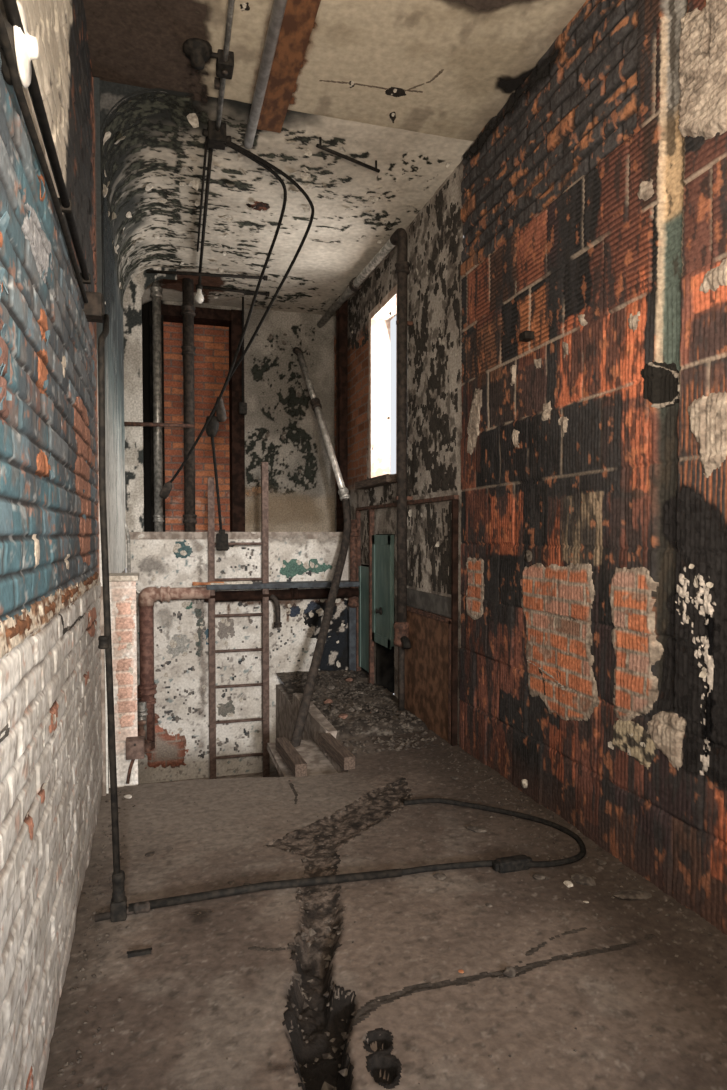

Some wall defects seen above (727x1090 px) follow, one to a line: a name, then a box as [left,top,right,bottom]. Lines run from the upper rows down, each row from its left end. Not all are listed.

peeling [21,174,53,283]
peeling [0,318,12,425]
peeling [35,308,66,398]
peeling [101,93,461,595]
spalling [0,397,100,658]
peeling [145,598,348,769]
flaking render [466,557,484,620]
flaking render [520,562,600,721]
flaking render [608,567,664,770]
peeling [675,564,716,725]
peeling [700,738,710,776]
crack [248,777,656,1090]